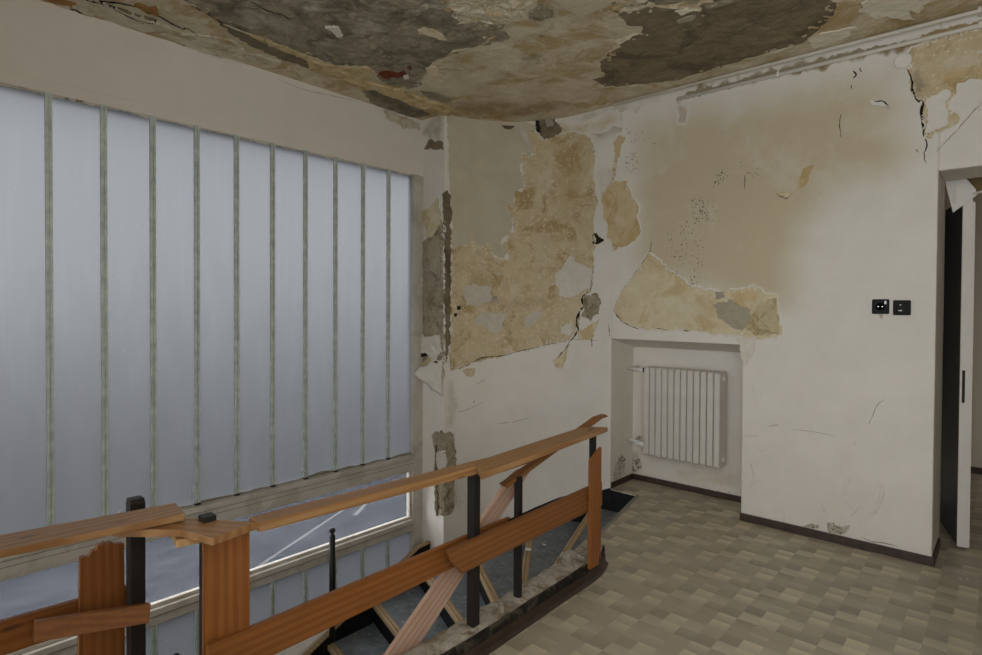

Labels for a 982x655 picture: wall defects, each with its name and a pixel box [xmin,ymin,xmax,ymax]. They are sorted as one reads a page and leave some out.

crack [70,0,240,33]
flaking render [41,0,510,130]
flaking render [587,0,982,140]
crack [907,69,979,162]
peeling [415,119,643,396]
crack [453,269,691,412]
peeling [614,252,784,366]
flaking render [431,430,457,471]
flaking render [434,479,464,516]